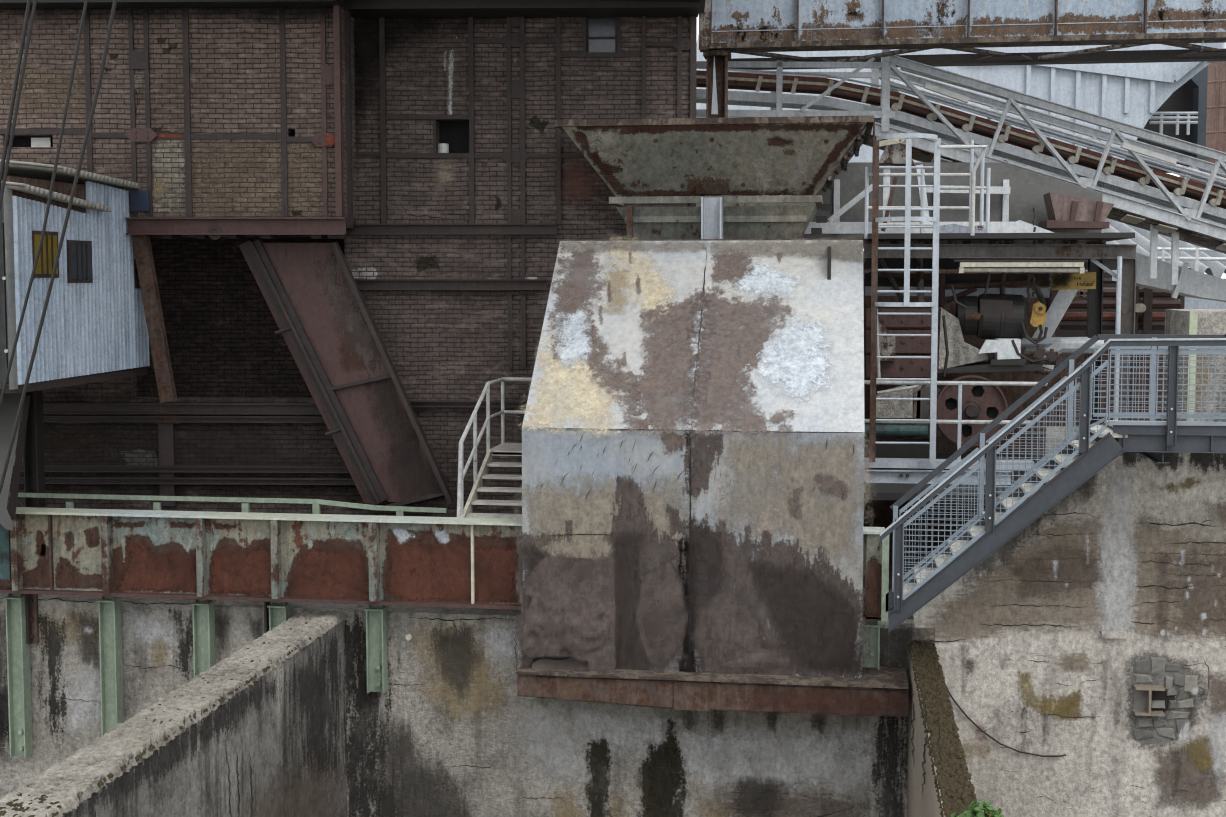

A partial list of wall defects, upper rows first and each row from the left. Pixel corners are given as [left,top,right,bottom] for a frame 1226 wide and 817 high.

rust [712,0,1226,43]
rust [574,123,862,197]
water stain [1121,452,1226,472]
water stain [613,534,650,670]
water stain [689,526,722,630]
water stain [752,562,861,674]
flaking render [1130,512,1226,638]
water stain [1156,545,1226,633]
water stain [38,609,472,817]
water stain [574,694,909,817]
spalling [1125,651,1205,749]
water stain [1175,675,1226,785]